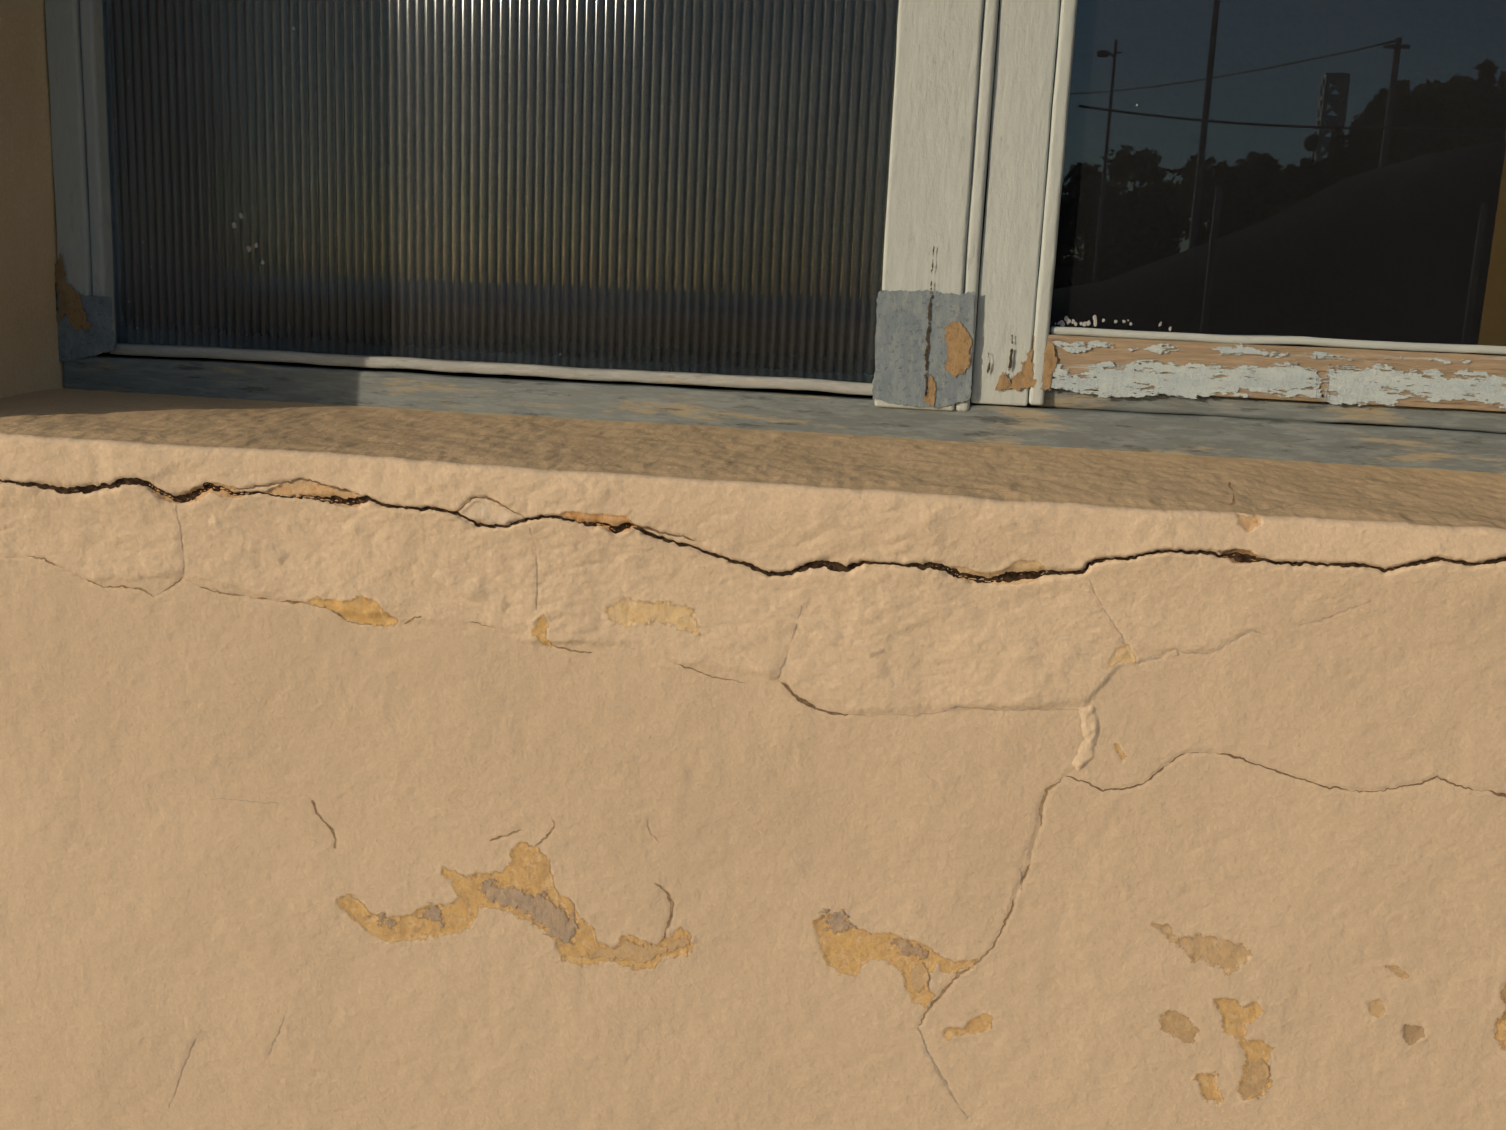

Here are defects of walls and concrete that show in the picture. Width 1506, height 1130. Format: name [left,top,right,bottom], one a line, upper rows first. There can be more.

peeling [923,321,972,407]
peeling [305,595,397,627]
crack [0,478,1506,717]
crack [209,798,336,849]
crack [490,820,564,847]
peeling [337,842,694,971]
crack [654,883,674,941]
peeling [812,908,977,1008]
peeling [1150,921,1254,978]
crack [917,752,1506,1119]
crack [168,1037,197,1108]
peeling [1194,998,1275,1105]